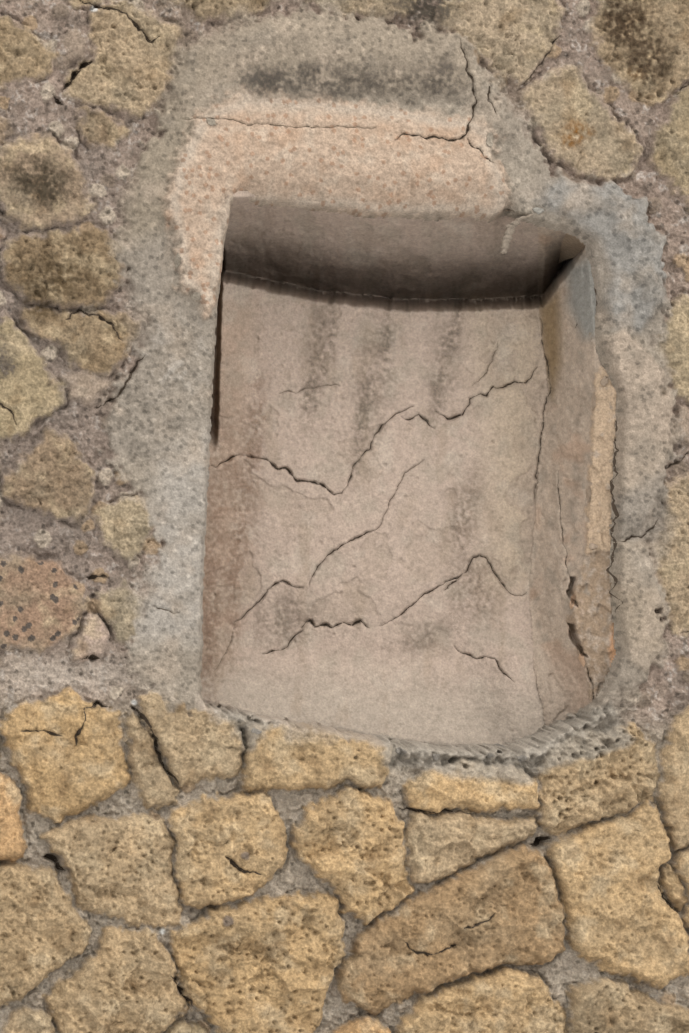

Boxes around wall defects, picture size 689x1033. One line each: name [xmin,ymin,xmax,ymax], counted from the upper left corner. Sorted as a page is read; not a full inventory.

leakage [604,0,663,79]
crack [211,318,571,581]
crack [215,462,421,670]
crack [391,555,527,621]
crack [457,650,513,681]